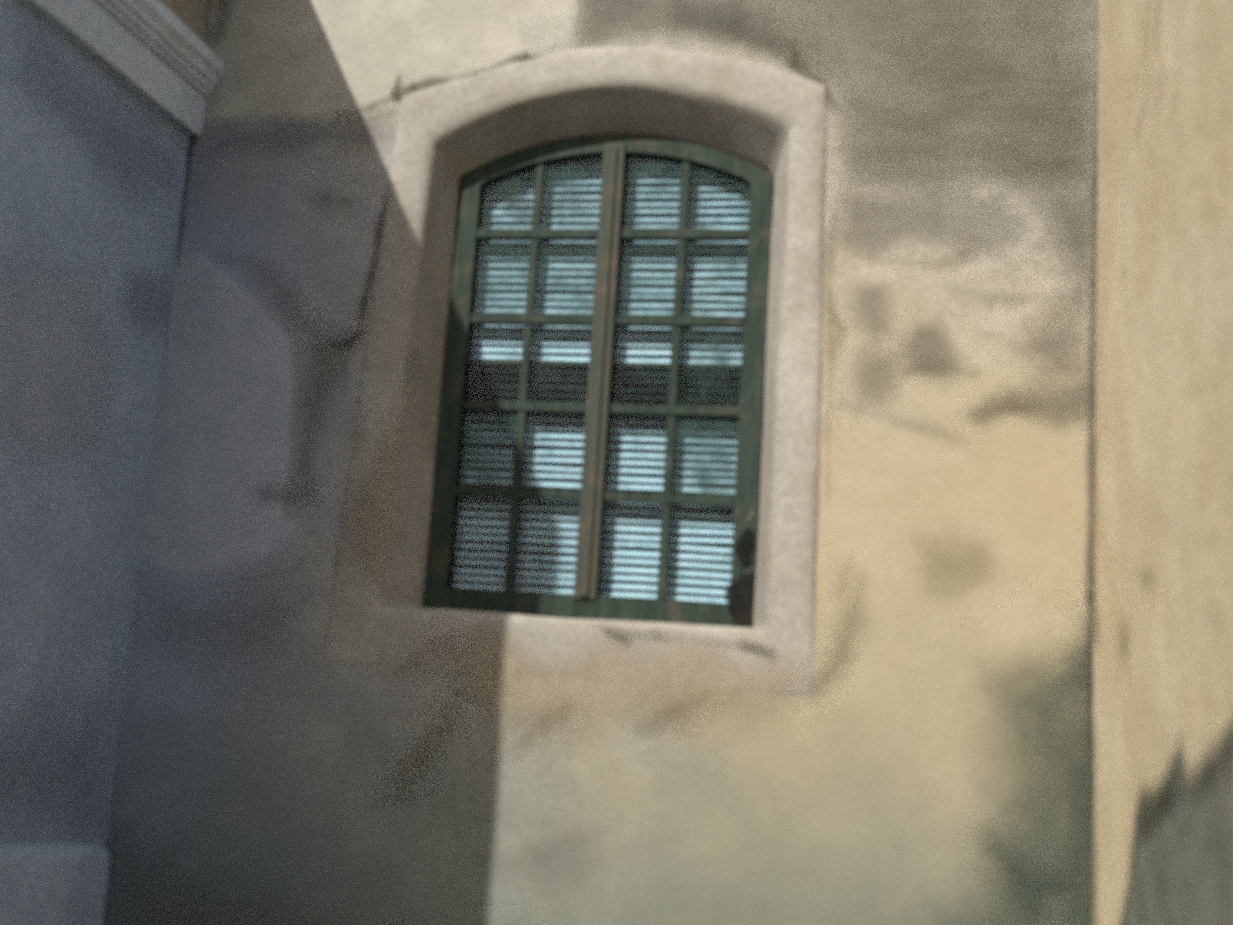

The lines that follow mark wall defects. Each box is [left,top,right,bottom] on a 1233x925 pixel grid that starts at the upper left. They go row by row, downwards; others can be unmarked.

leakage [996,654,1093,925]